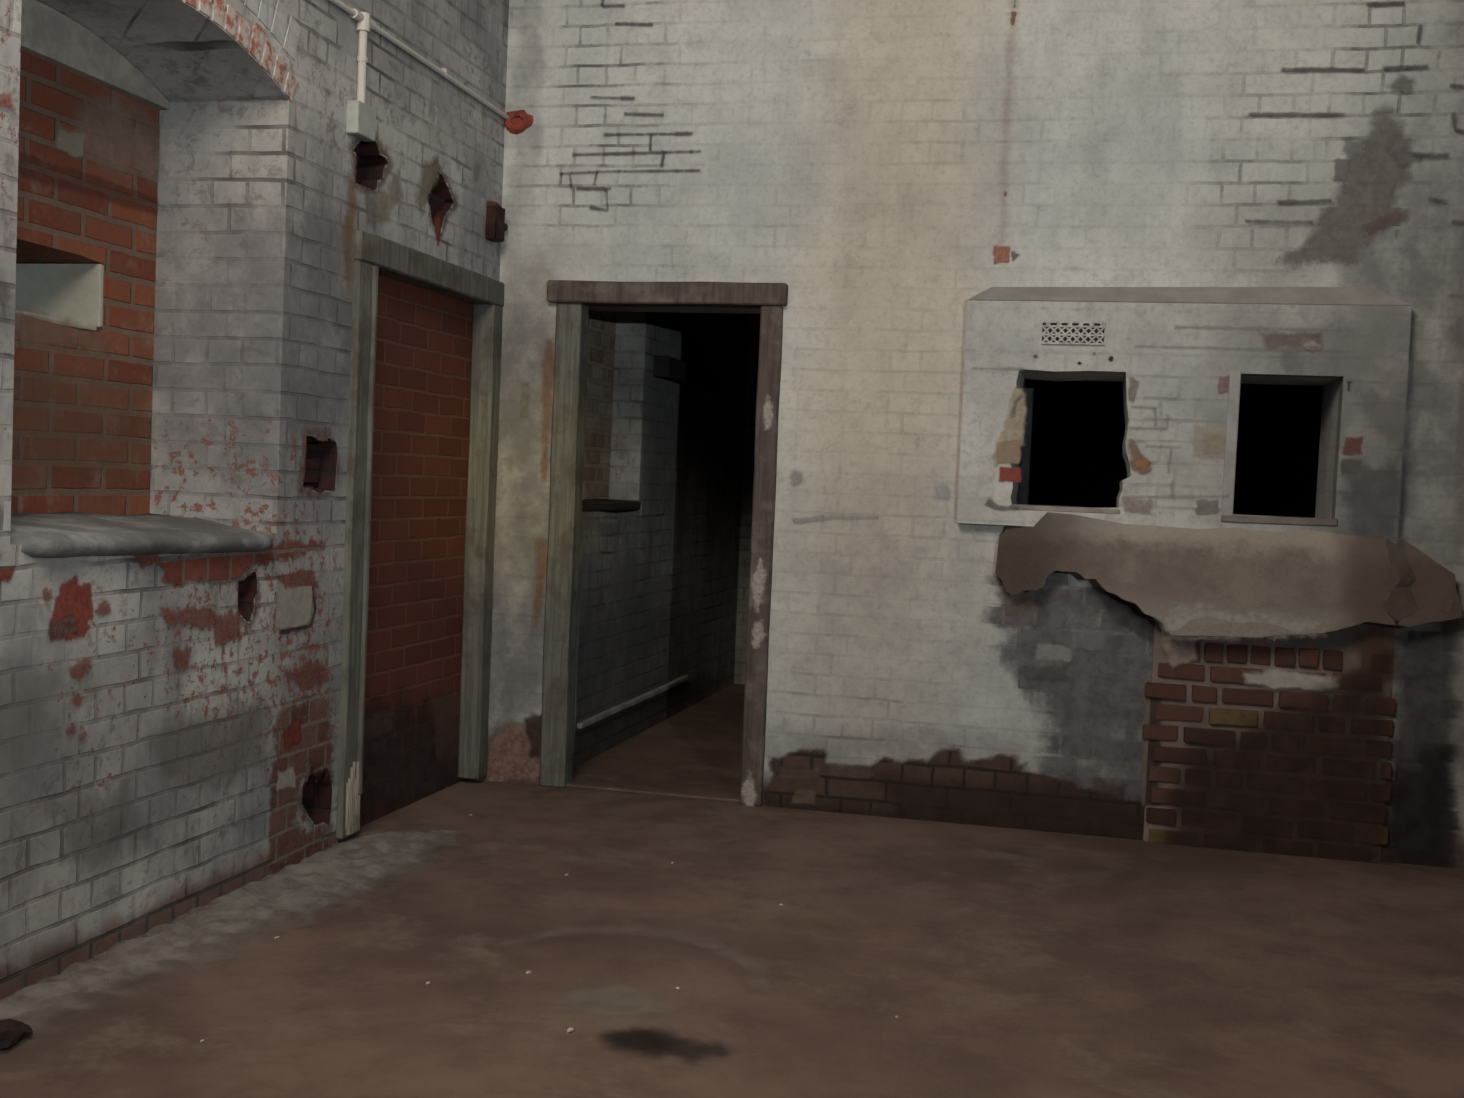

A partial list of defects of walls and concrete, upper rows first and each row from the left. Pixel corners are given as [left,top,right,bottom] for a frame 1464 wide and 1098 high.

flaking render [185,0,297,101]
water stain [1392,76,1412,95]
spalling [351,138,391,194]
spalling [427,161,458,235]
water stain [1285,110,1423,264]
spalling [298,430,339,498]
spalling [994,388,1026,482]
spalling [43,576,111,640]
flaking render [134,540,325,669]
peeling [751,558,766,648]
flaking render [269,659,333,870]
flaking render [741,622,1396,863]